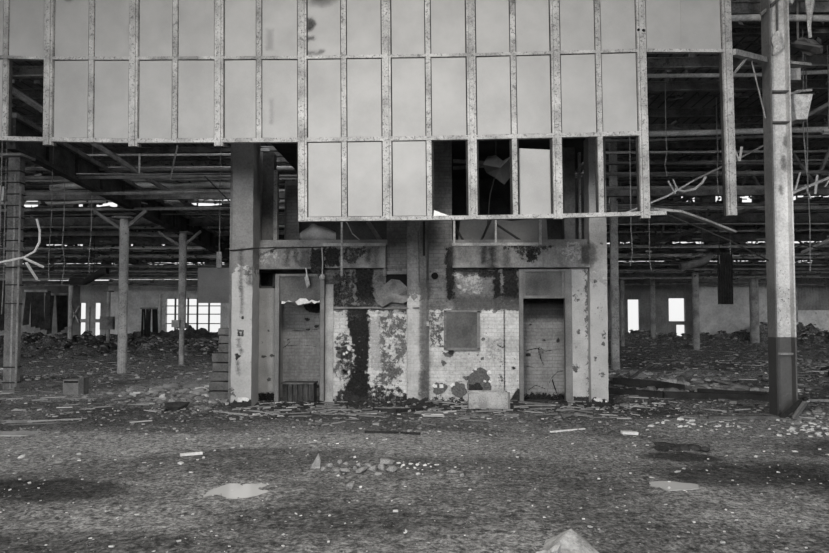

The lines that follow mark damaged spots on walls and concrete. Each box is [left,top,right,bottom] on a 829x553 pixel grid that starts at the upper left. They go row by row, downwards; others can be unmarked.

leakage [444,245,564,318]
leakage [284,246,407,403]
peeling [370,309,407,386]
spalling [406,357,516,403]